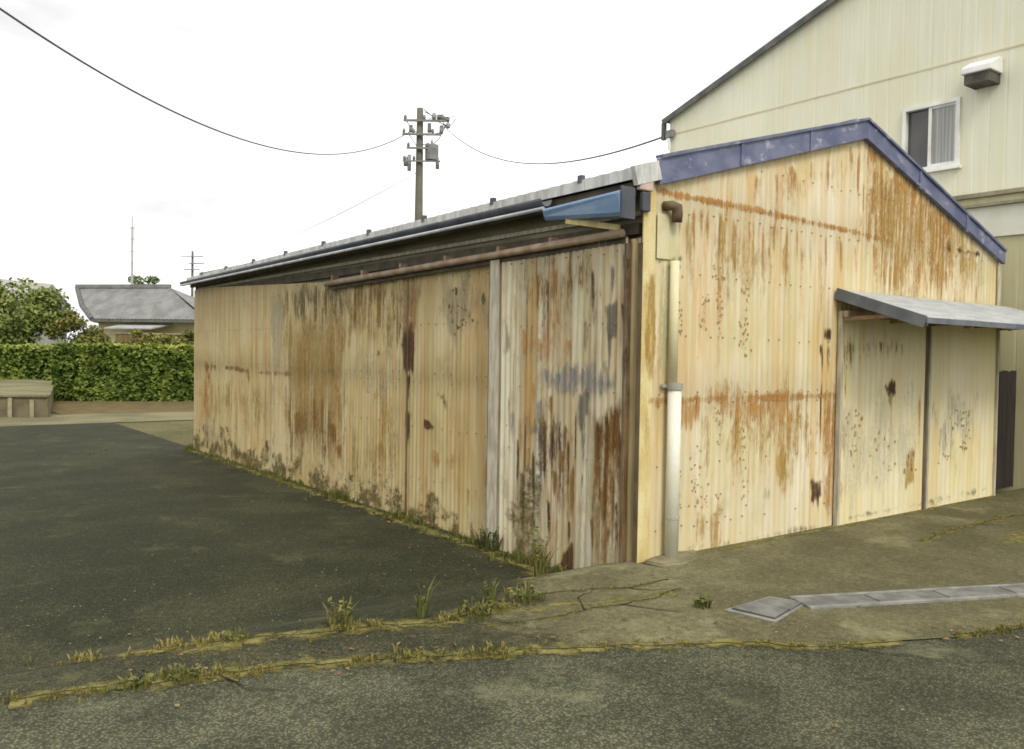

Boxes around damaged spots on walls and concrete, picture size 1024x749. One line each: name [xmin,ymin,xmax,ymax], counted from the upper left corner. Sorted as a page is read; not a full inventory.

corrosion [657,145,979,291]
corrosion [396,285,420,393]
corrosion [590,404,628,564]
corrosion [681,383,846,515]
corrosion [903,451,916,487]
crack [0,579,1024,709]